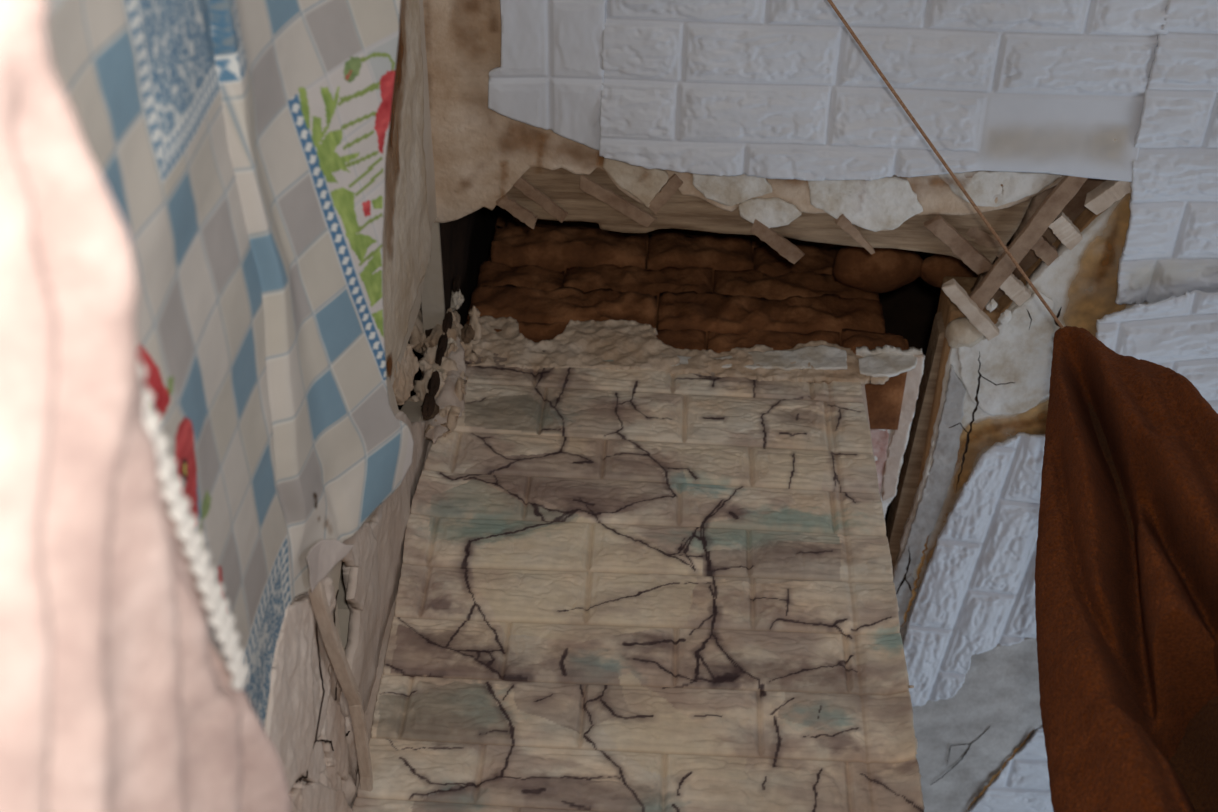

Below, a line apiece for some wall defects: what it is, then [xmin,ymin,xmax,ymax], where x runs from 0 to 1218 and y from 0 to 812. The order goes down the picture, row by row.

spalling [265,0,1066,812]
crack [896,548,918,594]
crack [949,351,1015,490]
spalling [893,194,1127,643]